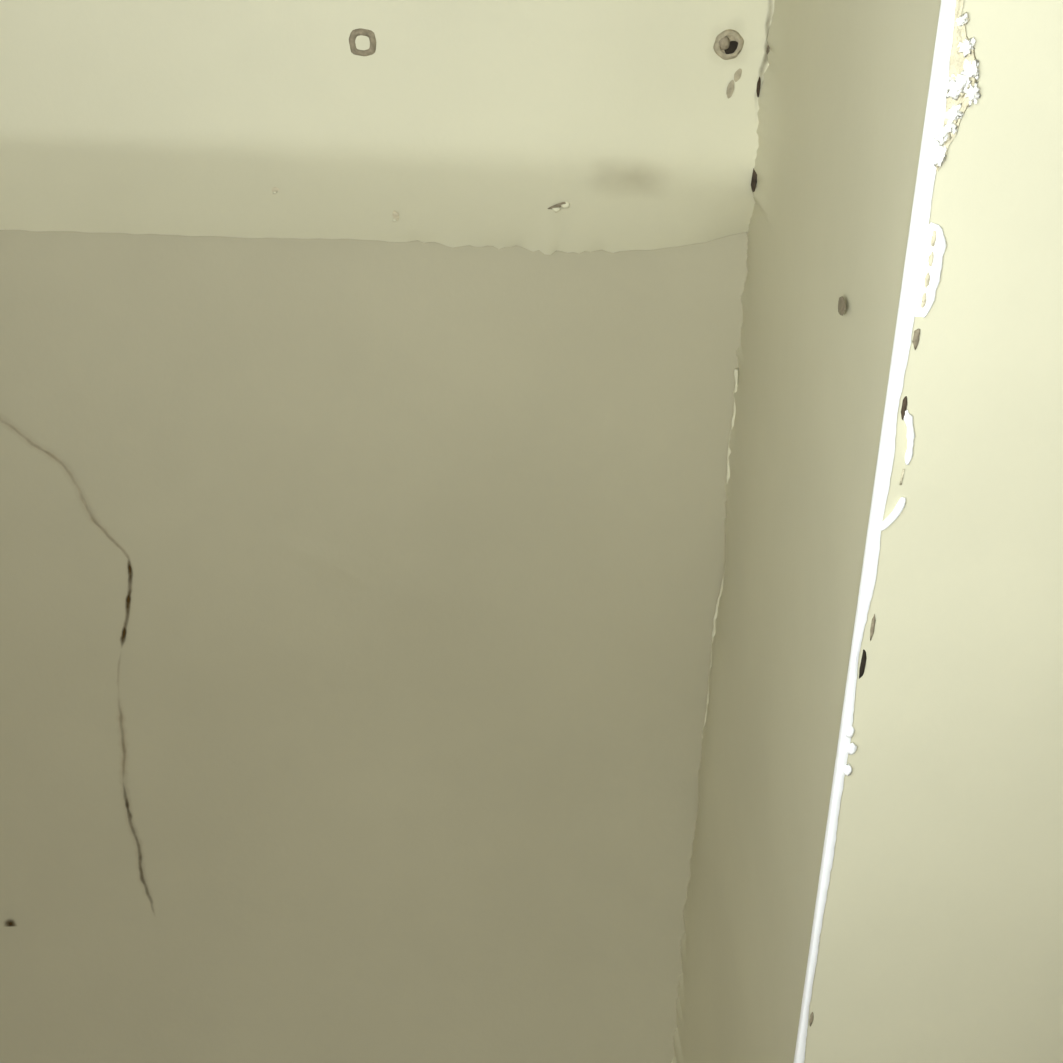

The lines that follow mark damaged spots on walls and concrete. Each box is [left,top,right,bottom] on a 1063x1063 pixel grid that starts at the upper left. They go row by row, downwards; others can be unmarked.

crack [121,564,132,643]